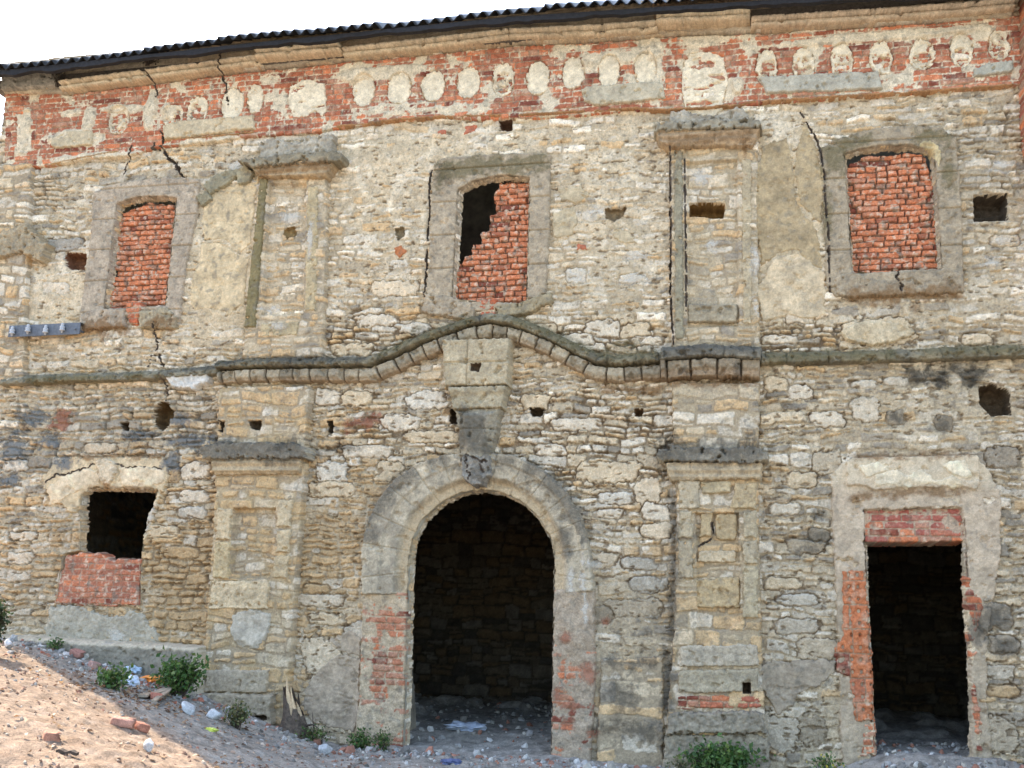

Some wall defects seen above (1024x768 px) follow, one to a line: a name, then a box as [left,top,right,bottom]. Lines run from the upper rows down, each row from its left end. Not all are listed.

crack [144,70,158,97]
crack [217,45,229,105]
crack [123,130,185,178]
crack [800,112,831,293]
crack [147,321,169,404]
crack [45,463,162,483]